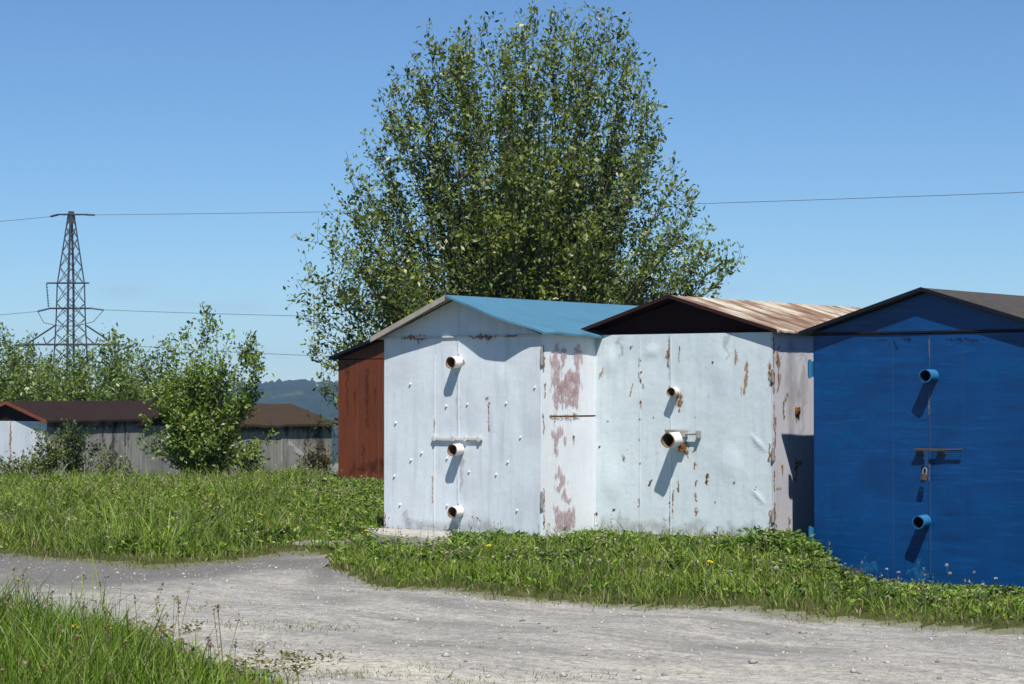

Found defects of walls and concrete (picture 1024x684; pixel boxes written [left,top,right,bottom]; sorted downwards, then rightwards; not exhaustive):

peeling [550,343,583,410]
peeling [551,426,575,532]
corrosion [767,337,798,535]